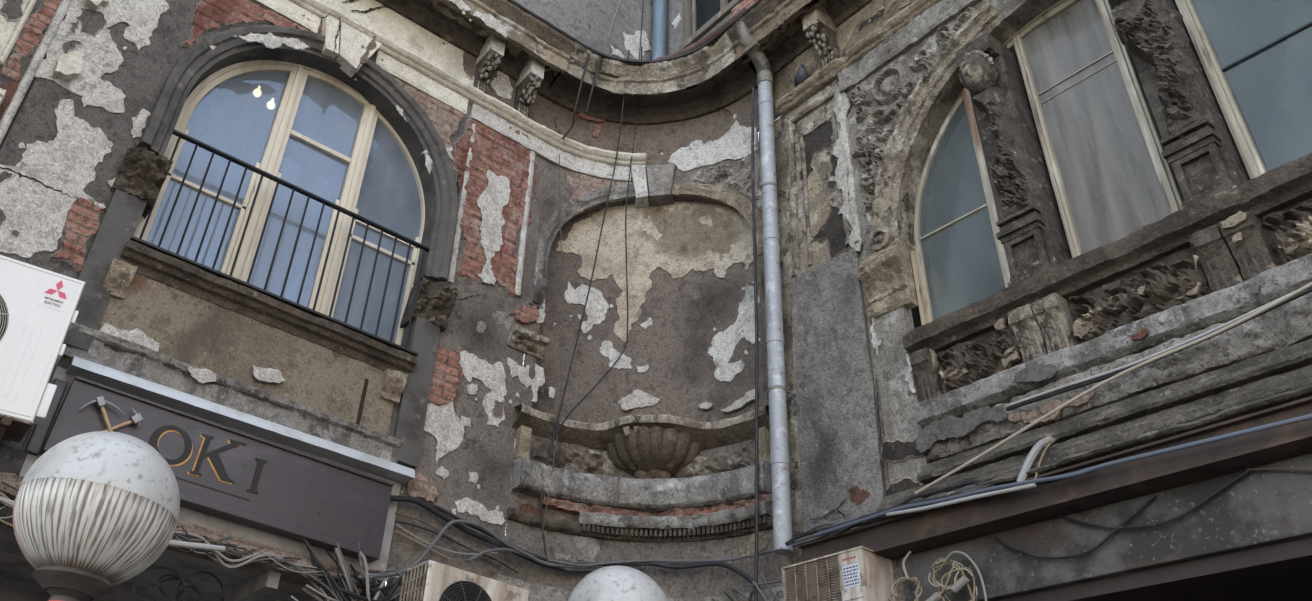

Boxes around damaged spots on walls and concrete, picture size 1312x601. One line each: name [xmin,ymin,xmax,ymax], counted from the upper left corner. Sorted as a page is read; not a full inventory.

flaking render [181,0,322,51]
flaking render [353,36,384,81]
flaking render [461,50,477,80]
flaking render [490,71,513,99]
flaking render [609,30,652,60]
flaking render [0,0,169,273]
flaking render [795,85,862,270]
flaking render [394,77,761,383]
flaking render [405,344,555,503]
flaking render [452,472,506,525]